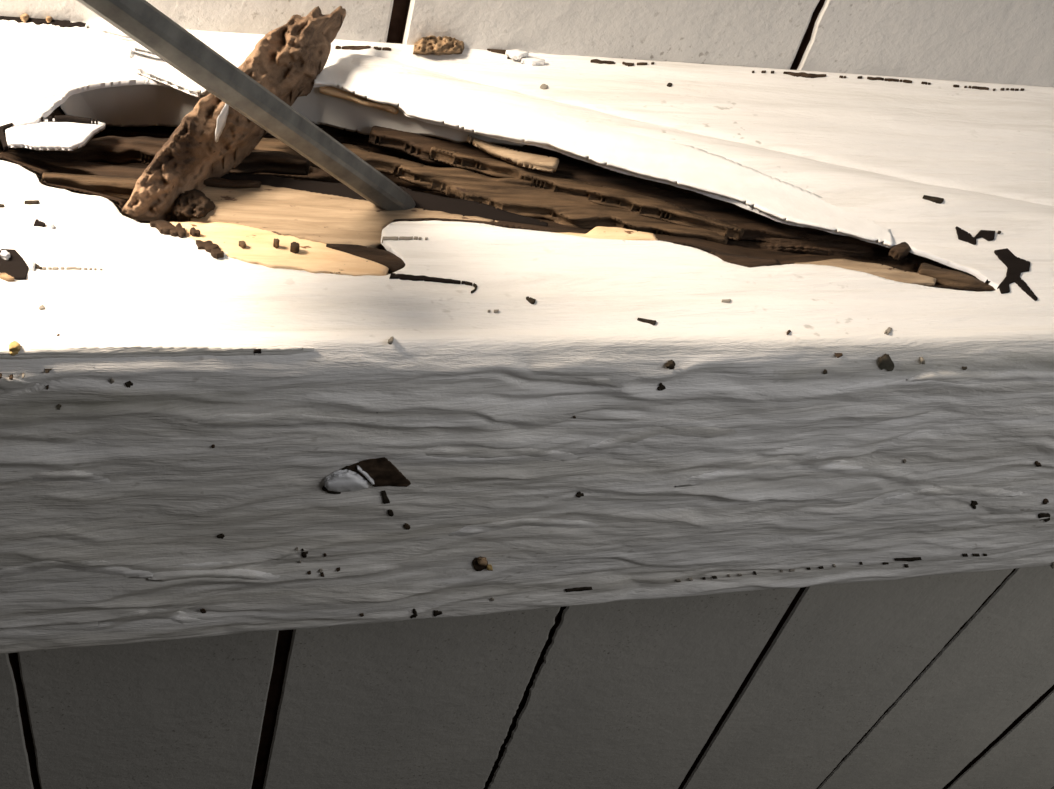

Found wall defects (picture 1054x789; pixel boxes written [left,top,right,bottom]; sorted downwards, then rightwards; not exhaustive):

peeling [487,49,545,66]
spalling [0,18,207,213]
spalling [137,52,1038,301]
crack [382,235,428,243]
peeling [0,249,102,282]
crack [389,273,499,313]
crack [526,296,536,304]
peeling [322,457,411,494]